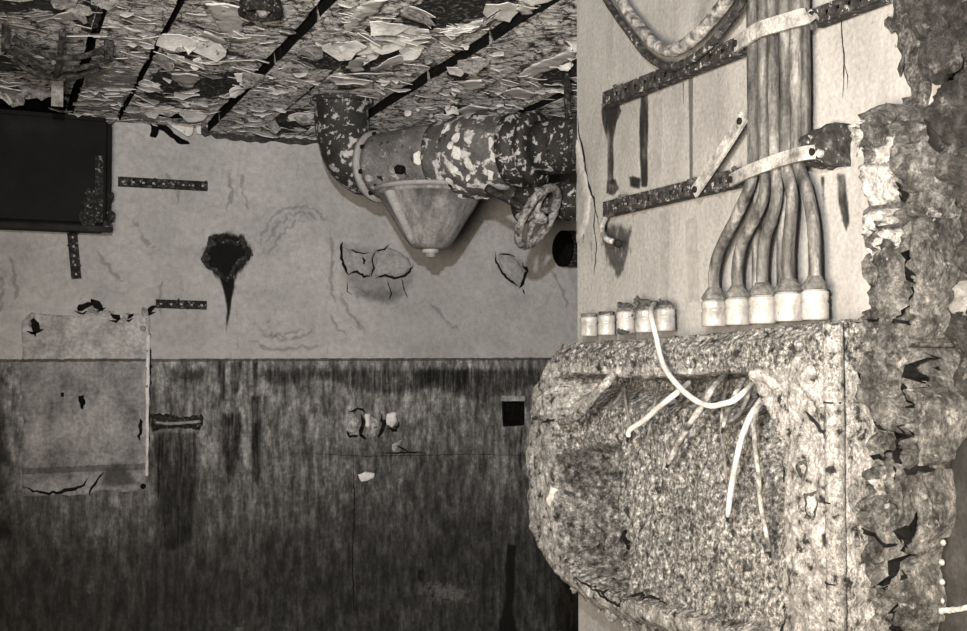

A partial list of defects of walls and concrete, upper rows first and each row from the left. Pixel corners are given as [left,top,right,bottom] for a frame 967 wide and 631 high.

peeling [884,0,932,107]
spalling [0,0,577,199]
rust [601,83,660,200]
rust [838,175,849,228]
peeling [876,162,966,348]
peeling [75,299,156,326]
crack [89,472,104,496]
water stain [104,466,133,486]
peeling [346,408,418,454]
water stain [545,484,558,507]
peeling [855,384,967,539]
water stain [498,544,516,631]